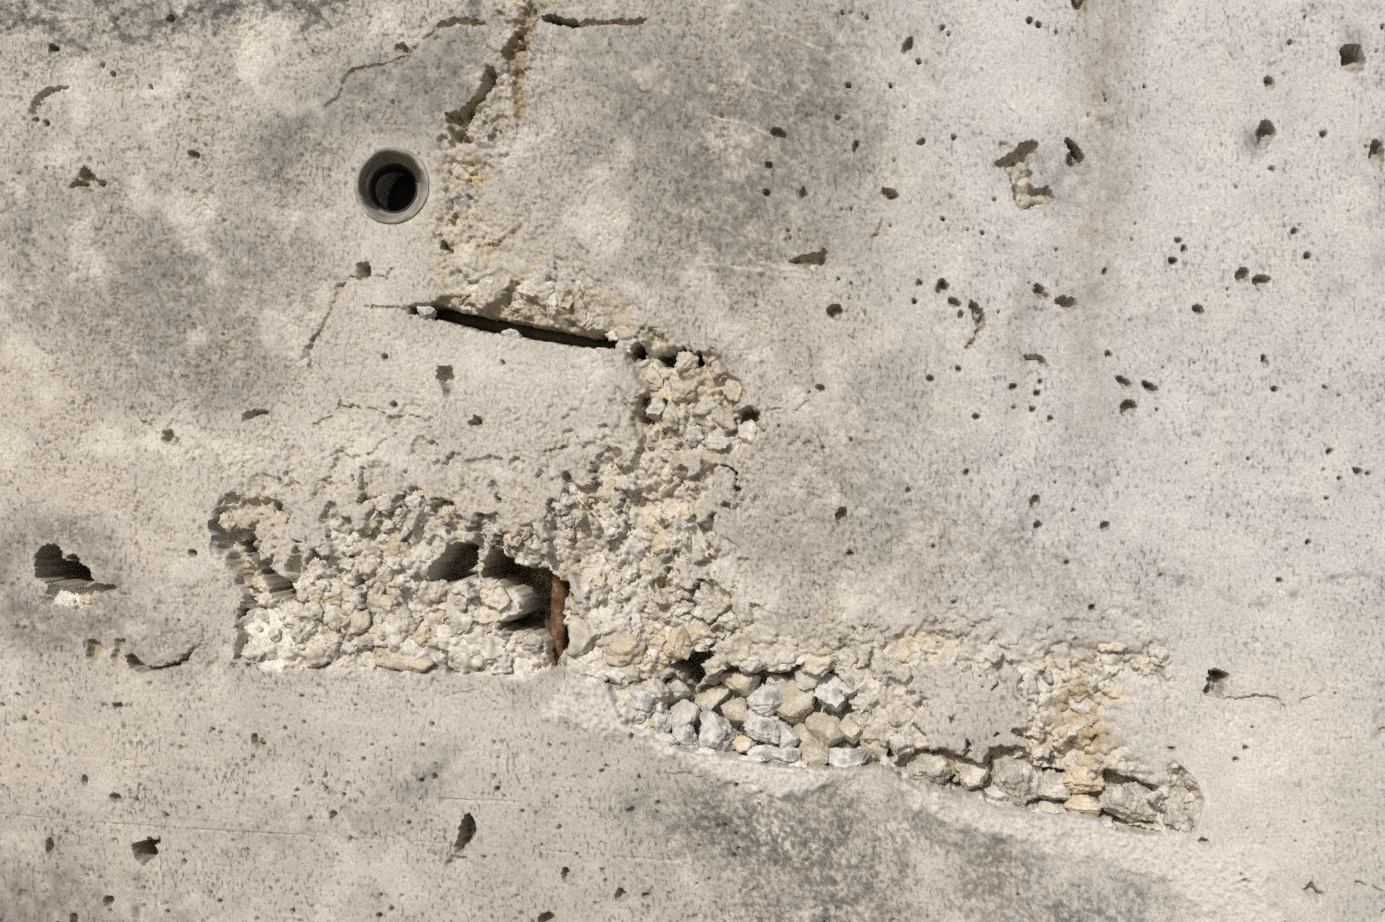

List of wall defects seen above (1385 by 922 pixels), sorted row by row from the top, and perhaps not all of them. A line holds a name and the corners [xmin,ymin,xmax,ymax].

spalling [354,261,393,284]
spalling [1032,283,1077,317]
spalling [400,275,705,369]
spalling [963,298,988,351]
spalling [435,364,455,402]
spalling [638,395,669,428]
spalling [739,406,761,424]
spalling [209,493,297,604]
spalling [34,543,117,621]
spalling [427,541,571,671]
spalling [670,650,717,687]
crack [1355,881,1385,916]